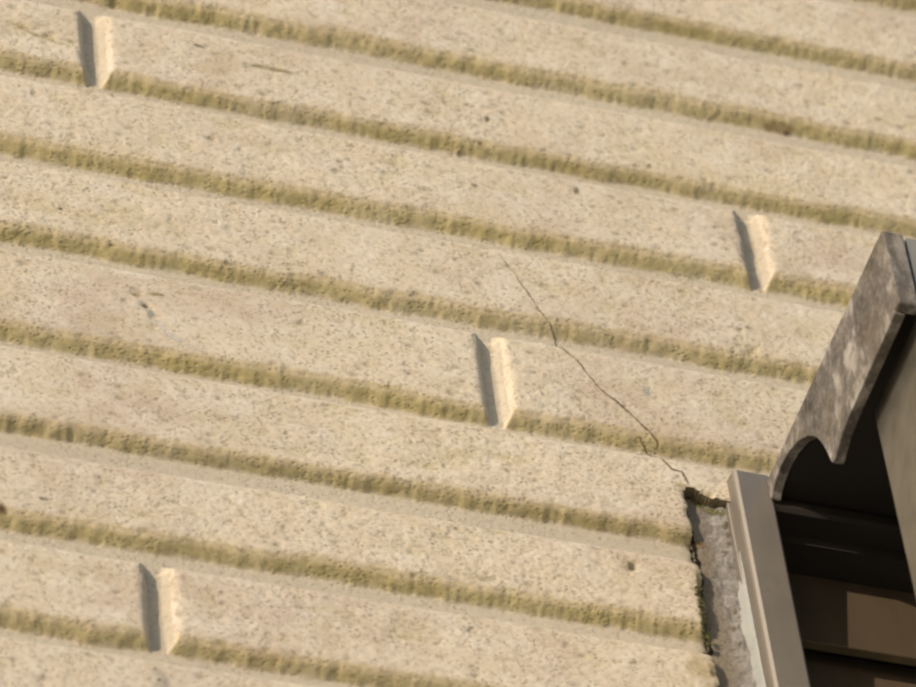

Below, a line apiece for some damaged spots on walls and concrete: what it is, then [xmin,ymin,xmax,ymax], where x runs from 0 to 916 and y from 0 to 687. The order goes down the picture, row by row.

crack [500,255,689,485]